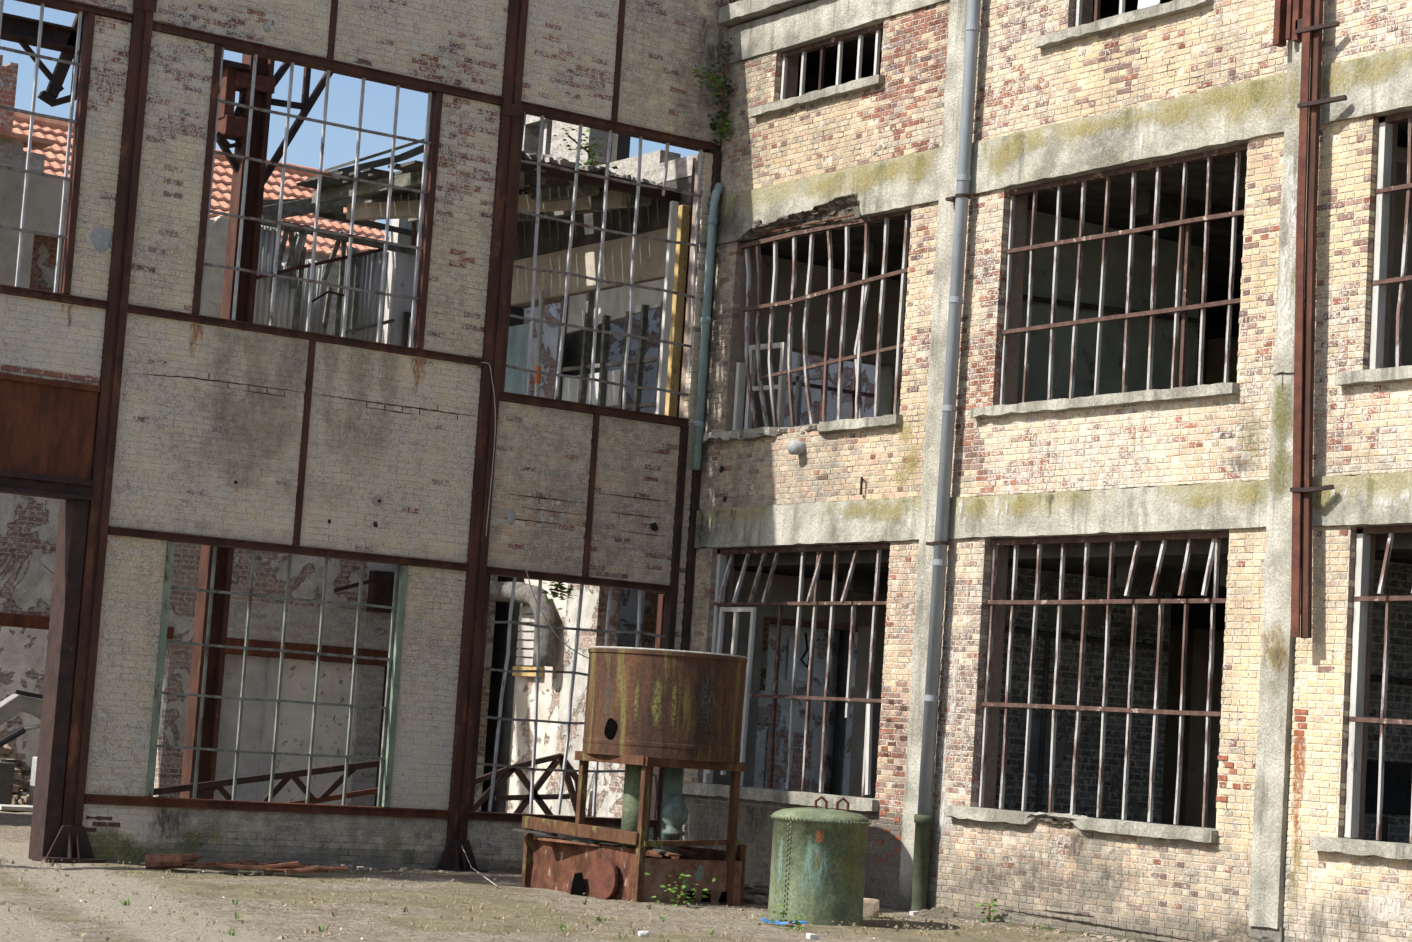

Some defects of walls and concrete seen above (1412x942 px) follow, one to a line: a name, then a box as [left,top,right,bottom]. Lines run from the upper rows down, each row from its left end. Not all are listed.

leakage [1313,489,1347,508]